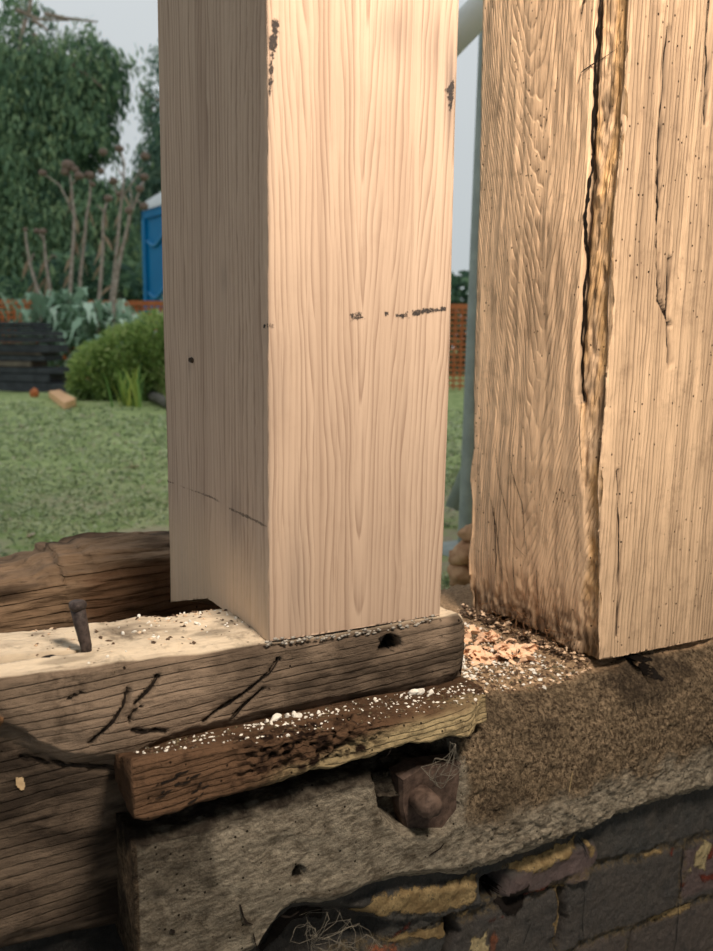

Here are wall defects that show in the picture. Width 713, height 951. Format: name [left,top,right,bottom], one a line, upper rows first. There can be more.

crack [578,0,615,468]
crack [655,29,668,347]
peeling [470,931,489,951]
peeling [688,840,713,872]